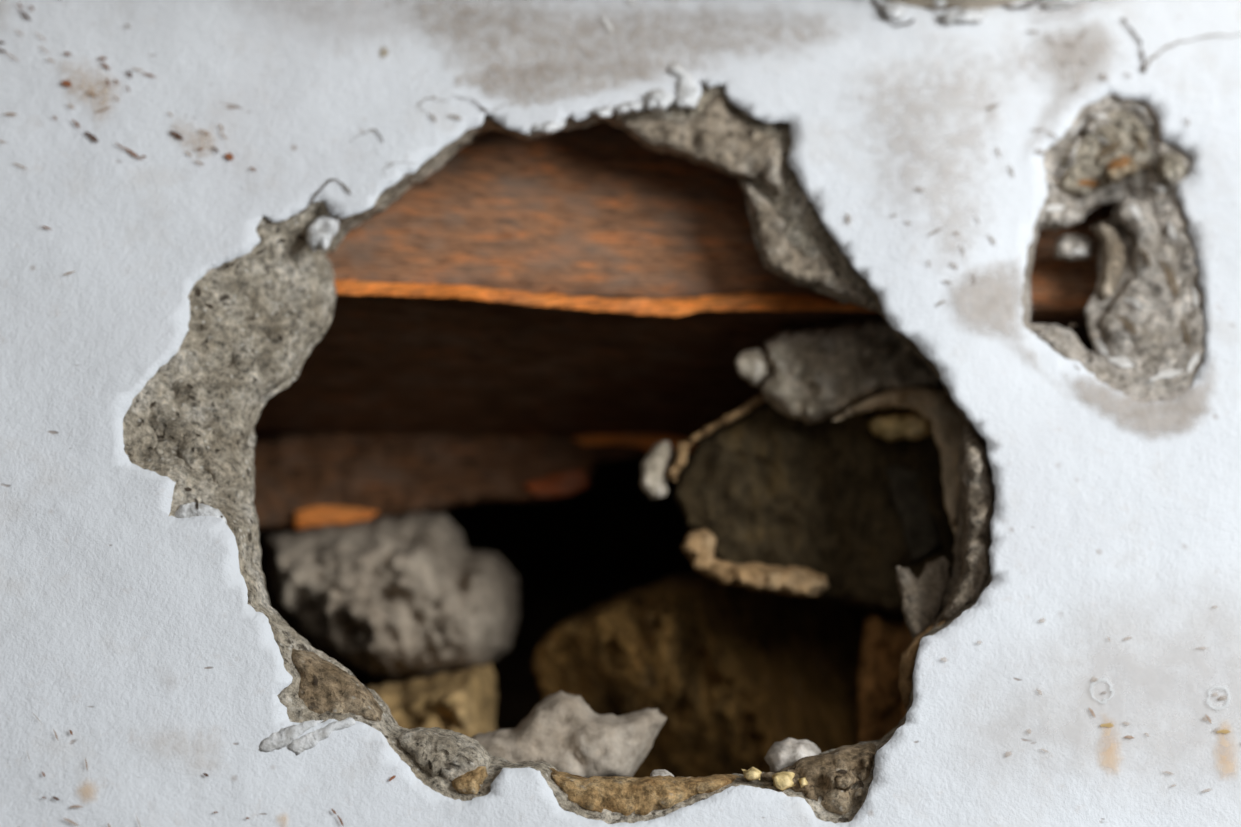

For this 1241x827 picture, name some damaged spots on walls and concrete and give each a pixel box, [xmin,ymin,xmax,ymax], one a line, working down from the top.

leakage [422,1,739,100]
crack [1116,18,1238,146]
leakage [929,210,1018,333]
spalling [1021,94,1205,403]
spalling [123,63,995,824]
leakage [1075,381,1210,435]
rust [1089,678,1134,765]